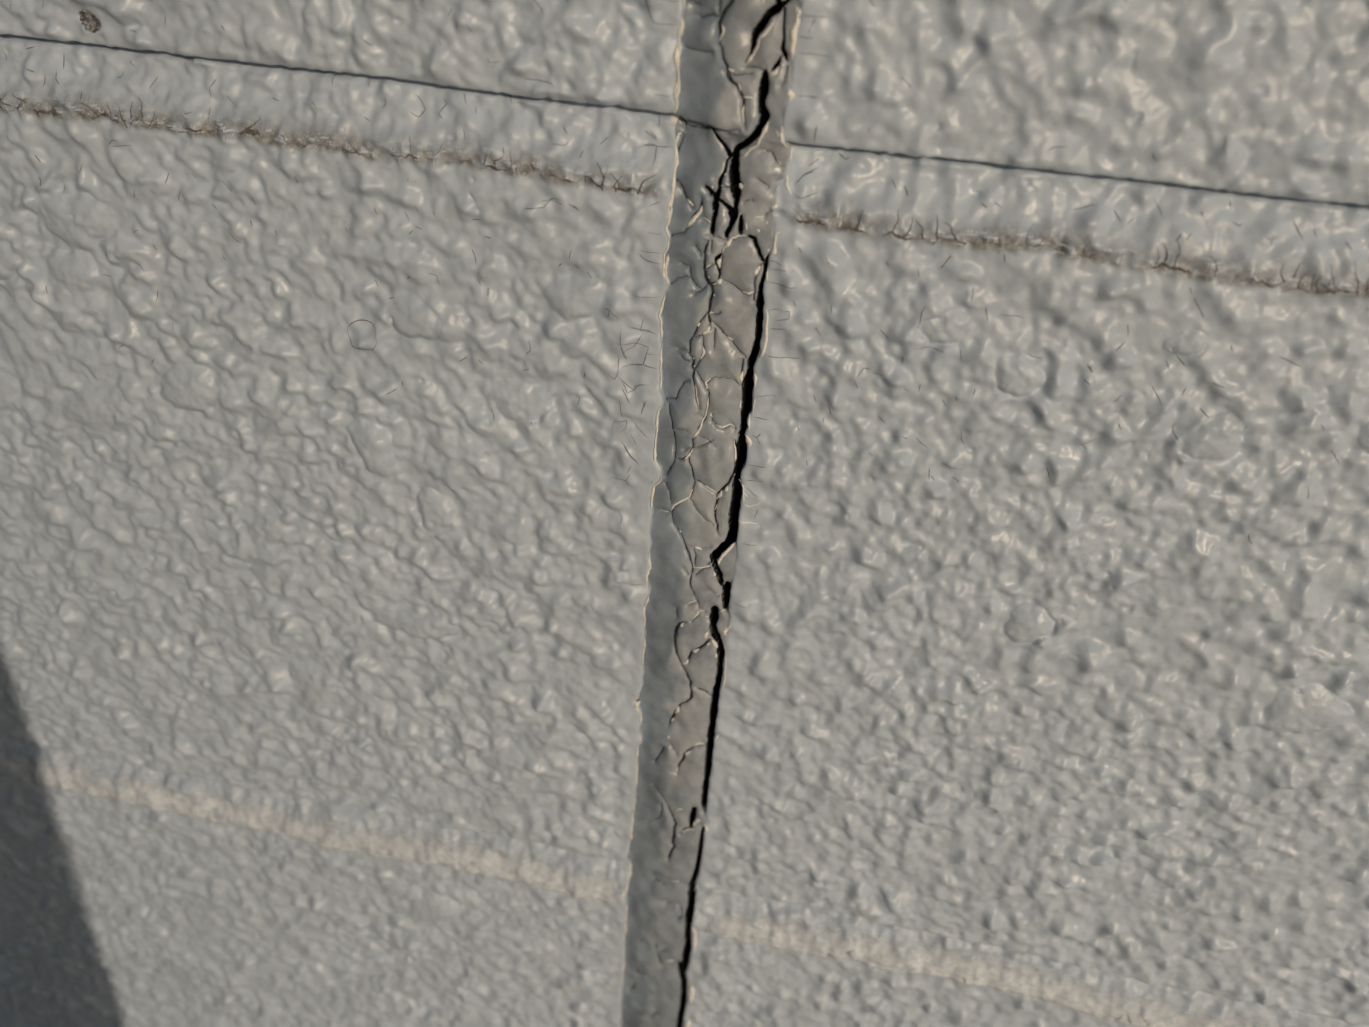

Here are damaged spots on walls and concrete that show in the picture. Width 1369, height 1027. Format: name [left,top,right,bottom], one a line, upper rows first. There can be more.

crack [0,1,364,193]
crack [347,273,440,350]
crack [1070,198,1369,317]
crack [1084,326,1226,441]
crack [365,0,1105,1027]